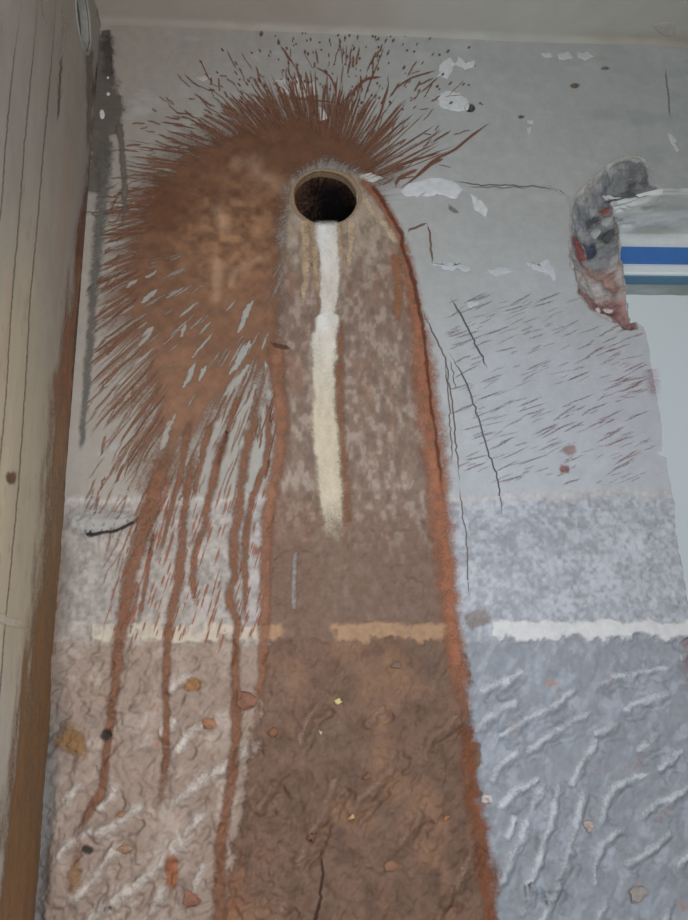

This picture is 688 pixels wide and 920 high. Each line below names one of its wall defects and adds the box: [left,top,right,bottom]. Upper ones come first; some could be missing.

peeling [437,90,469,112]
peeling [438,56,476,79]
crack [426,227,434,261]
peeling [401,177,488,217]
spalling [569,155,657,331]
damp [299,221,356,526]
crack [424,314,459,469]
rust [0,32,486,920]
crack [460,496,469,592]
rust [464,728,497,920]